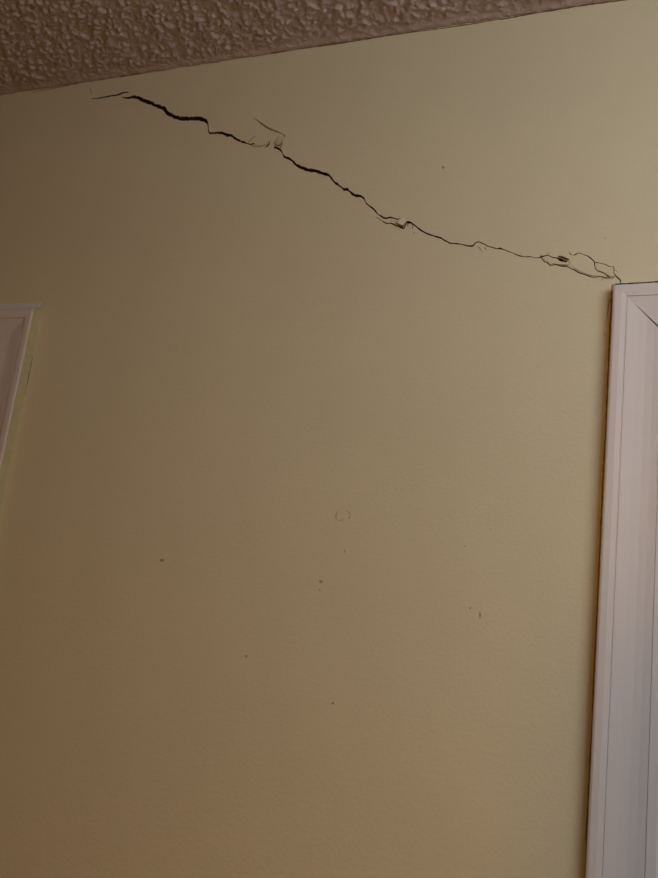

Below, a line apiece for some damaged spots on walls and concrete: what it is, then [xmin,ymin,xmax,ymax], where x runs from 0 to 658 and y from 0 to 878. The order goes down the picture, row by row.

crack [271,0,625,54]
crack [89,88,658,870]